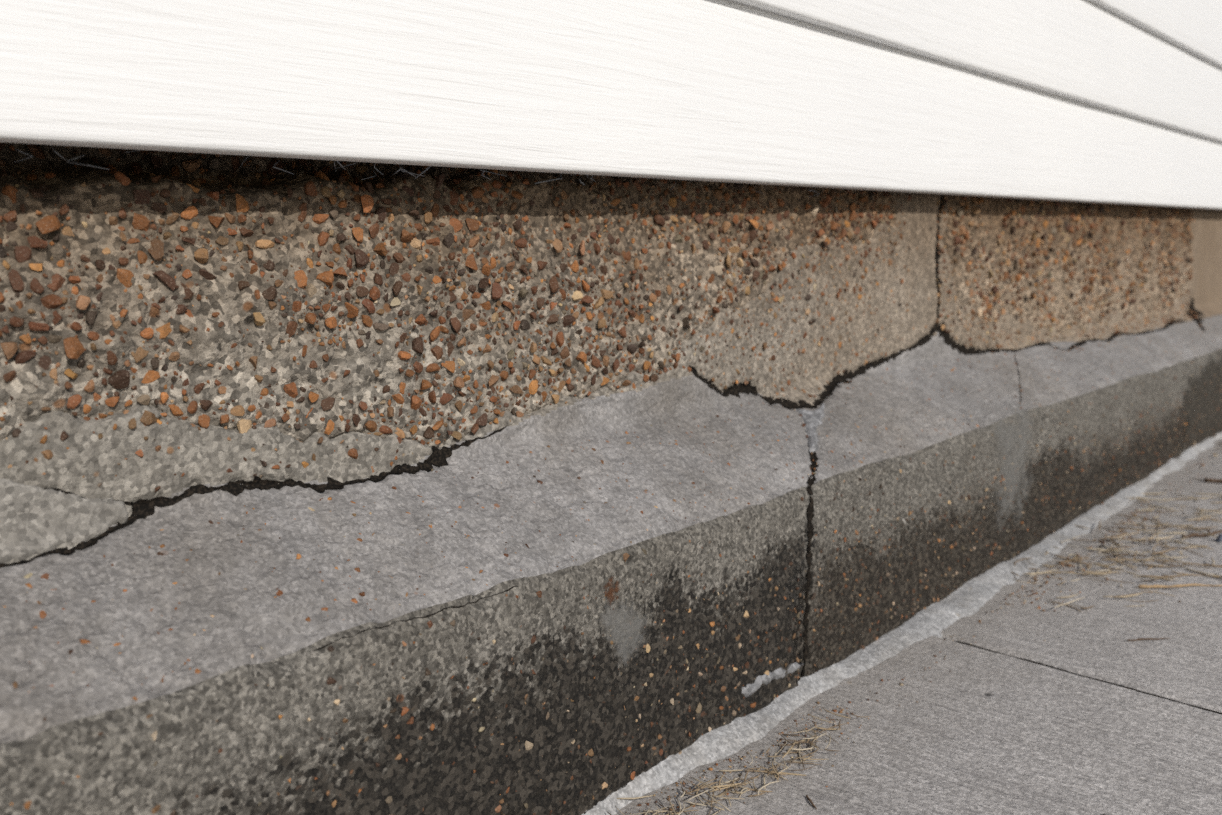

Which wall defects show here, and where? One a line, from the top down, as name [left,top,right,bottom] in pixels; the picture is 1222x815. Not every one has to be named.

spalling [0,142,897,450]
crack [689,195,1207,409]
peeling [0,478,128,563]
crack [0,427,505,567]
damp [177,358,1222,815]